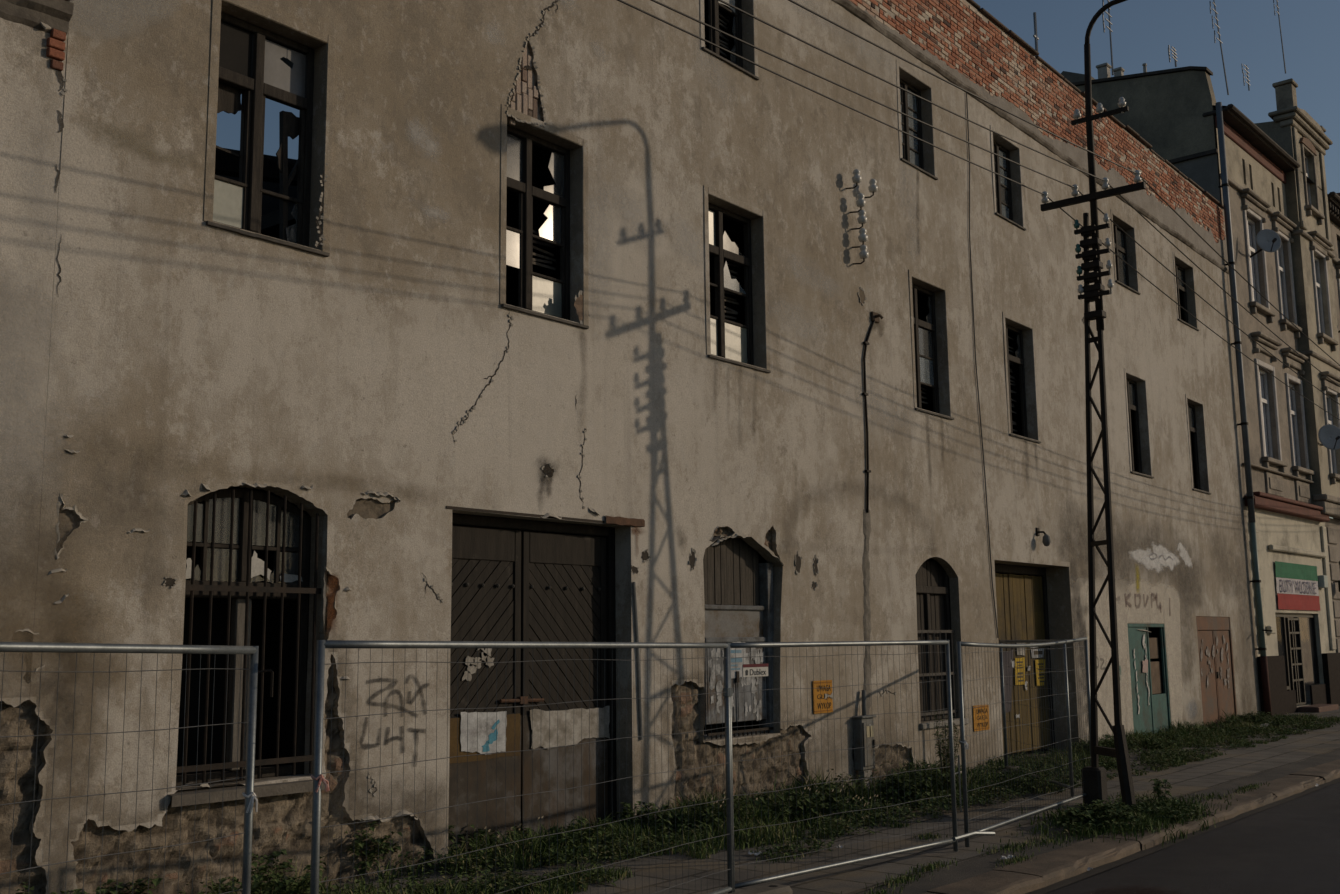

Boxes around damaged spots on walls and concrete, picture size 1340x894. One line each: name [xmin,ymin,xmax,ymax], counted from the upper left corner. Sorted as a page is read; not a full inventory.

flaking render [0,628,442,894]